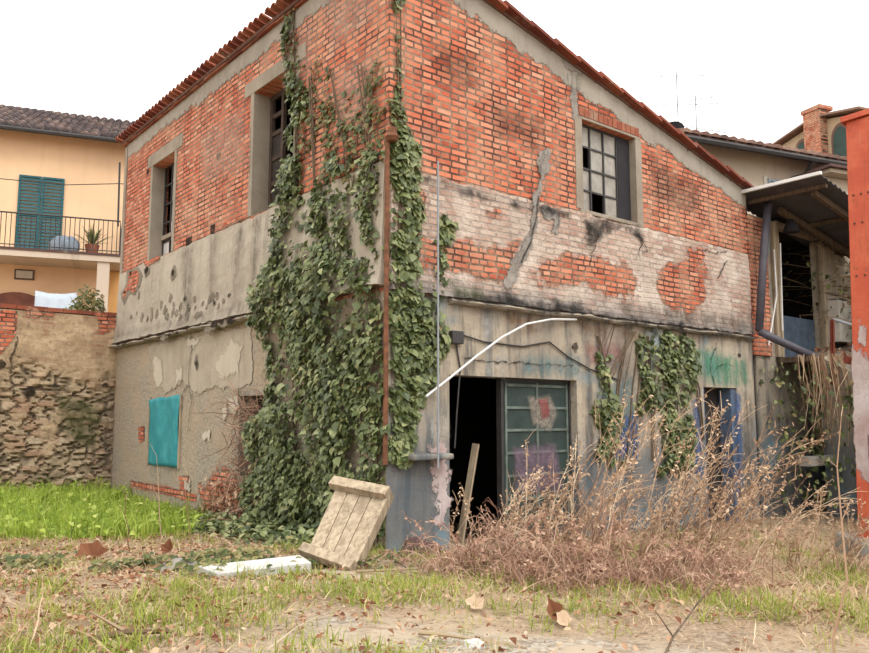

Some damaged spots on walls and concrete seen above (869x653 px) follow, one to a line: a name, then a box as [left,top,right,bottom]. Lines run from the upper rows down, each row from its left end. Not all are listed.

flaking render [210,216,243,234]
crack [503,149,551,290]
spalling [120,255,160,304]
flaking render [413,234,521,282]
flaking render [534,250,637,301]
flaking render [657,246,707,316]
flaking render [0,307,54,369]
flaking render [95,311,116,335]
flaking render [130,292,253,421]
damp [457,292,613,322]
peeling [851,325,869,483]
flaking render [131,465,237,513]